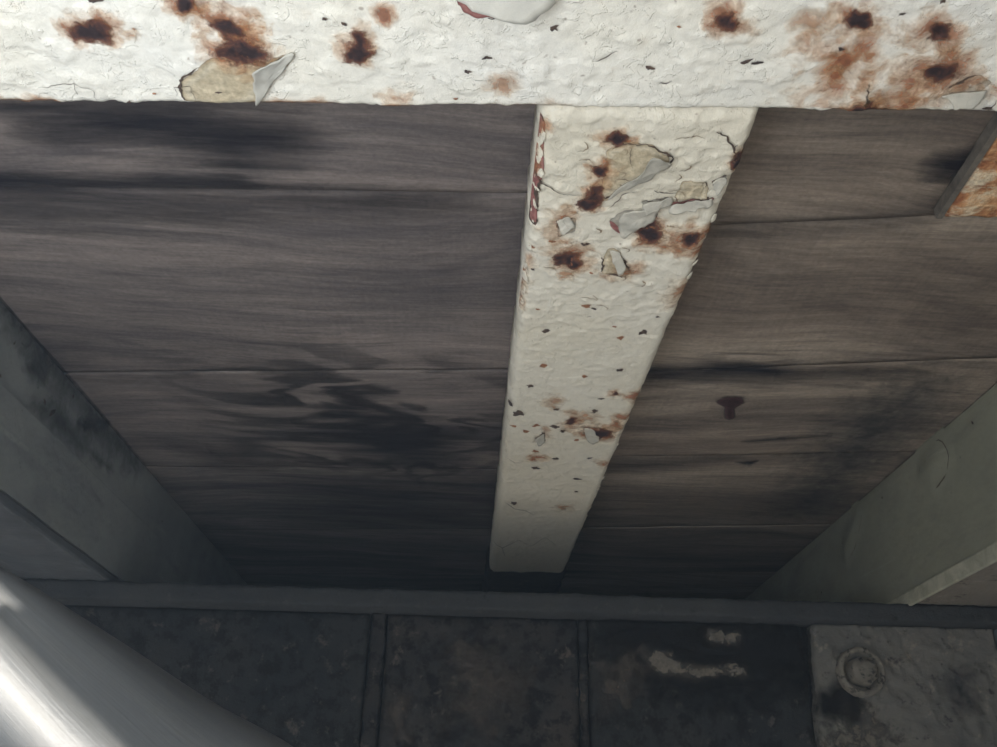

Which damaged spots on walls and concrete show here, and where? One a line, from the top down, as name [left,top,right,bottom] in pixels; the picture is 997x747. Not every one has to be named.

rust [59,13,120,46]
rust [165,0,270,74]
peeling [178,53,294,106]
rust [343,30,377,65]
peeling [457,0,556,25]
rust [793,8,876,98]
peeling [942,75,992,110]
leakage [0,104,305,203]
rust [555,158,610,225]
peeling [601,142,674,201]
peeling [610,175,727,239]
leakage [229,369,463,470]